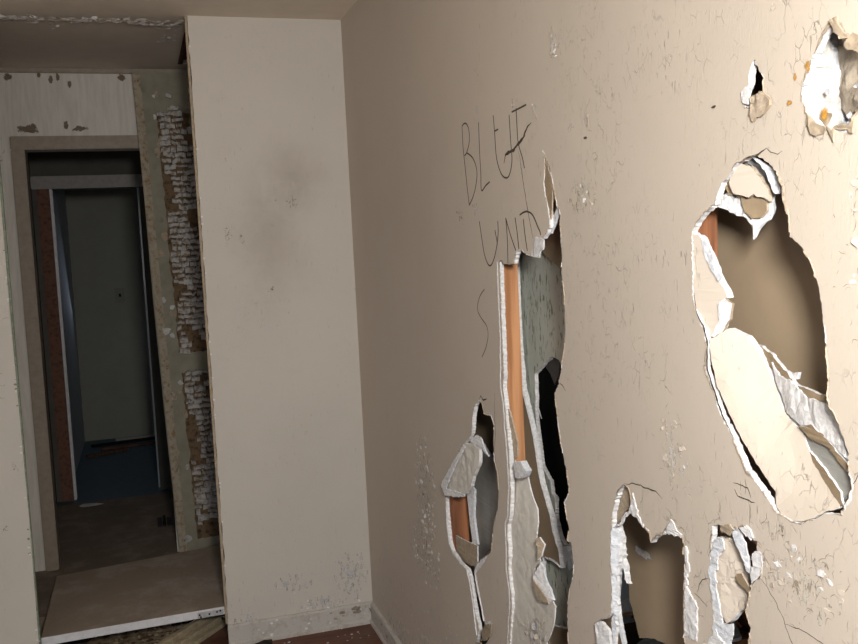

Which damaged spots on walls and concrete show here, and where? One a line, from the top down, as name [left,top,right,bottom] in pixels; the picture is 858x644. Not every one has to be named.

spalling [741,67,772,122]
spalling [800,16,858,142]
spalling [415,150,603,644]
spalling [692,155,854,540]
spalling [594,484,858,644]